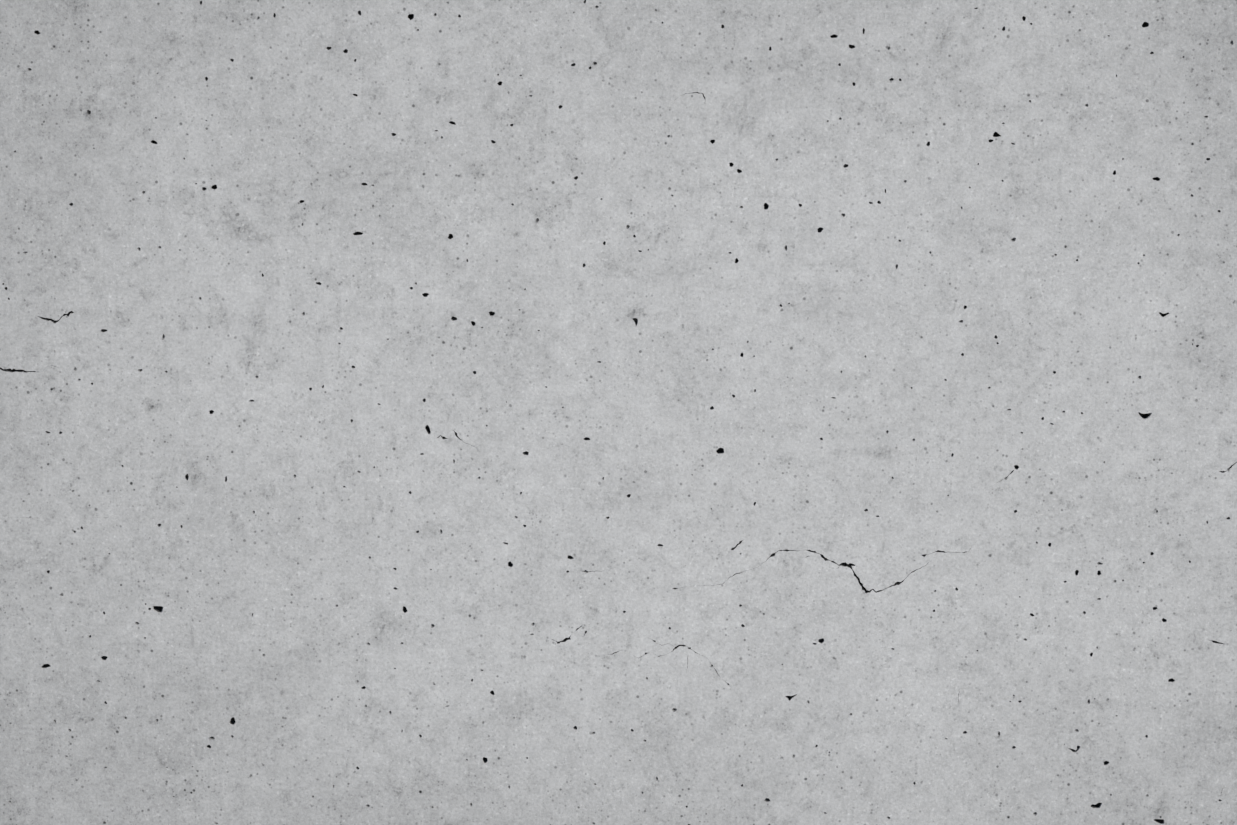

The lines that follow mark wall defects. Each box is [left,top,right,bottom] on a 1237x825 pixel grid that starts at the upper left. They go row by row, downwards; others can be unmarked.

crack [0,365,56,373]
crack [672,550,970,593]